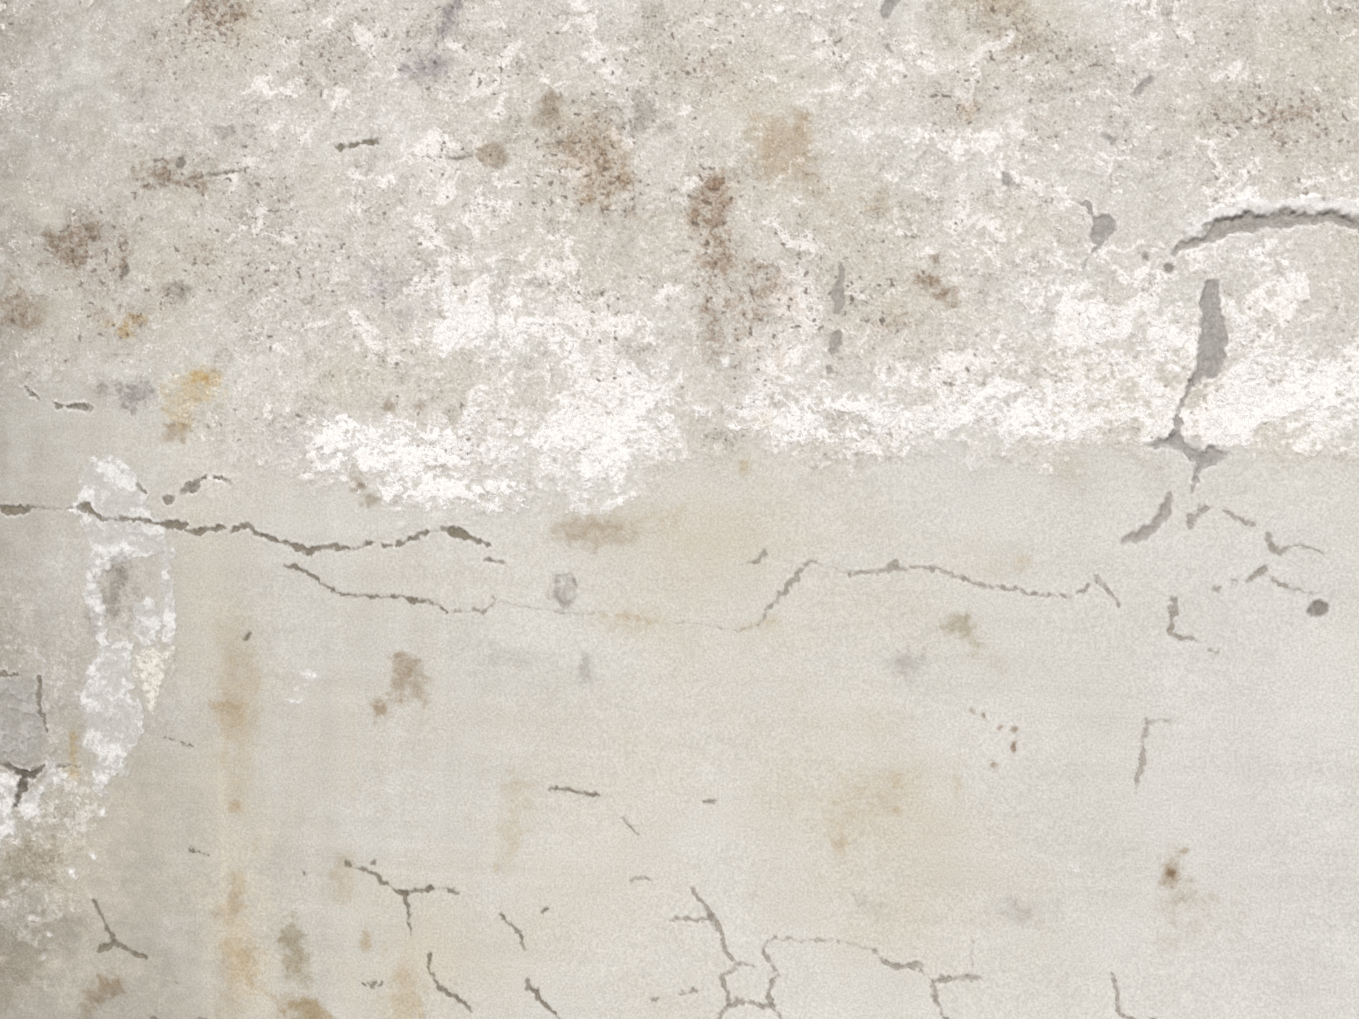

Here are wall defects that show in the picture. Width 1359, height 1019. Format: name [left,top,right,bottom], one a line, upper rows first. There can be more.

spalling [1165,212,1359,271]
spalling [832,264,844,313]
peeling [693,280,1359,489]
crack [0,504,34,516]
spalling [1122,493,1171,543]
spalling [1187,506,1210,529]
crack [78,502,496,614]
crack [848,560,1120,607]
peeling [68,454,226,816]
crack [5,765,45,807]
crack [345,861,472,1012]
crack [652,888,780,1019]